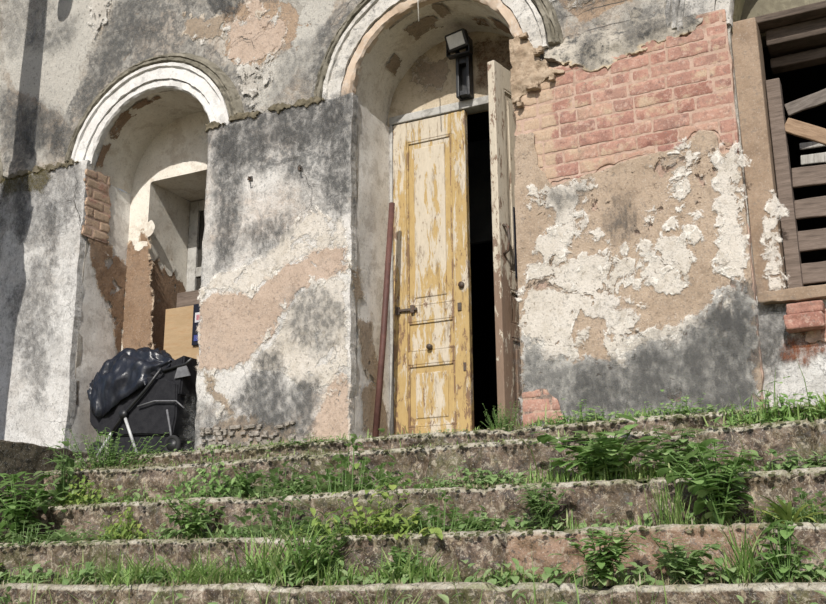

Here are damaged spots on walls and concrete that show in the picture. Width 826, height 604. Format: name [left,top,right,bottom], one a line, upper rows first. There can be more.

water stain [207,0,243,15]
flaking render [81,96,160,244]
peeling [134,220,175,276]
water stain [208,92,351,260]
flaking render [472,1,761,427]
peeling [760,189,789,291]
peeling [197,205,388,437]
water stain [525,285,788,421]
flaking render [196,405,317,450]